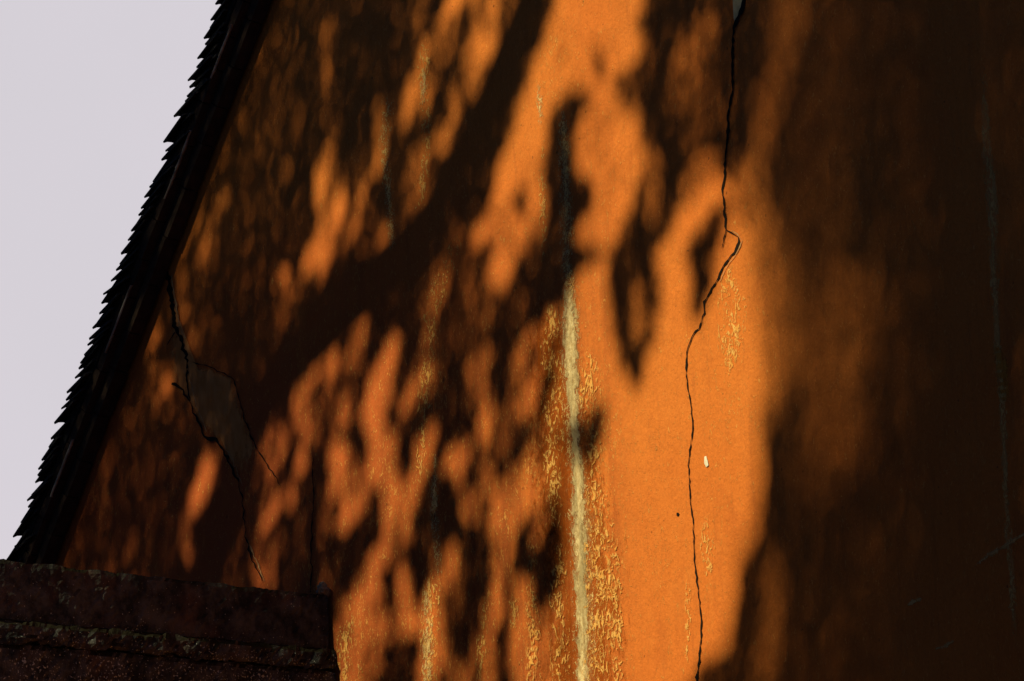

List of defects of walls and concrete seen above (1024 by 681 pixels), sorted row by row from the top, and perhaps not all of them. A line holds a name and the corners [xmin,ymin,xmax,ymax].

crack [165,271,280,580]
water stain [508,103,623,681]
crack [685,0,746,681]